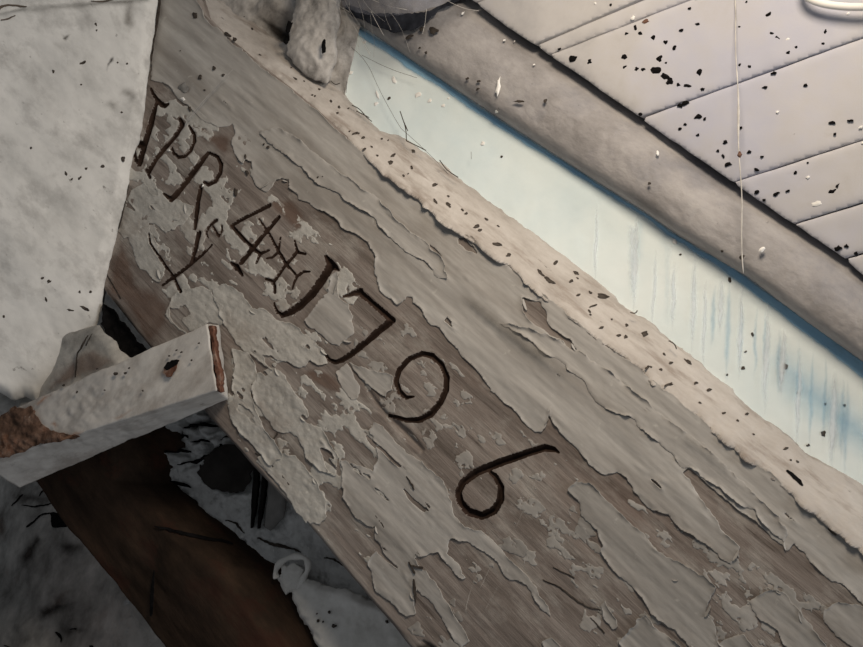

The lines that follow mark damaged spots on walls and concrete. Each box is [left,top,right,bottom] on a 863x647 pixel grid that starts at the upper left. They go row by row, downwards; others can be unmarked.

peeling [118,123,249,283]
spalling [101,304,147,358]
peeling [151,0,863,604]
peeling [515,477,753,647]
peeling [692,538,863,647]